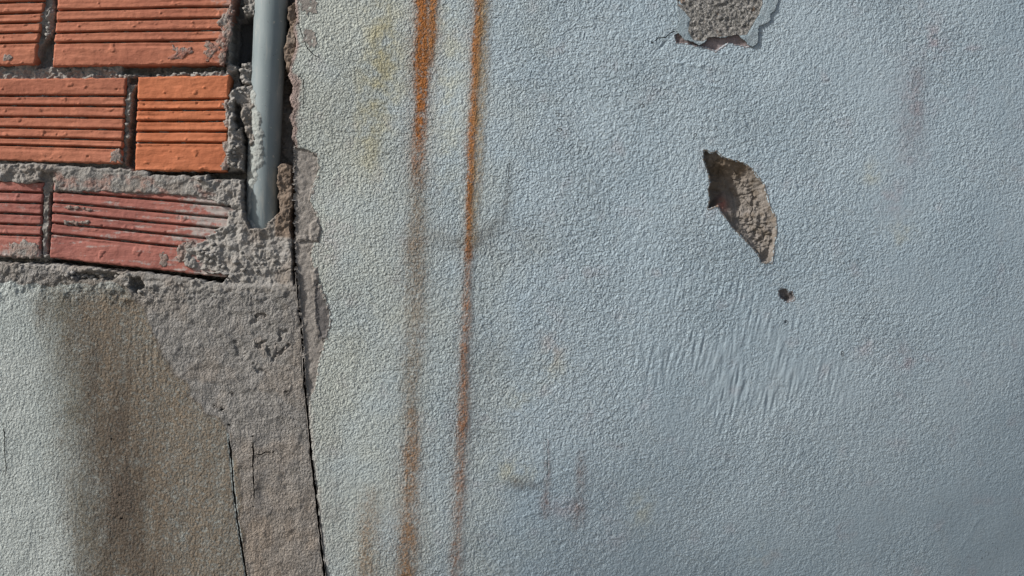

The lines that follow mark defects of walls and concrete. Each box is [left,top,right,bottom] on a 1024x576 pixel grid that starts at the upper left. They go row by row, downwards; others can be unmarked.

rust [413,0,437,173]
flaking render [674,0,779,53]
rust [456,0,484,519]
spalling [702,149,778,264]
spalling [778,287,795,303]
leakage [61,290,244,576]
crack [226,425,273,576]
crack [295,272,327,576]
rust [399,423,419,576]